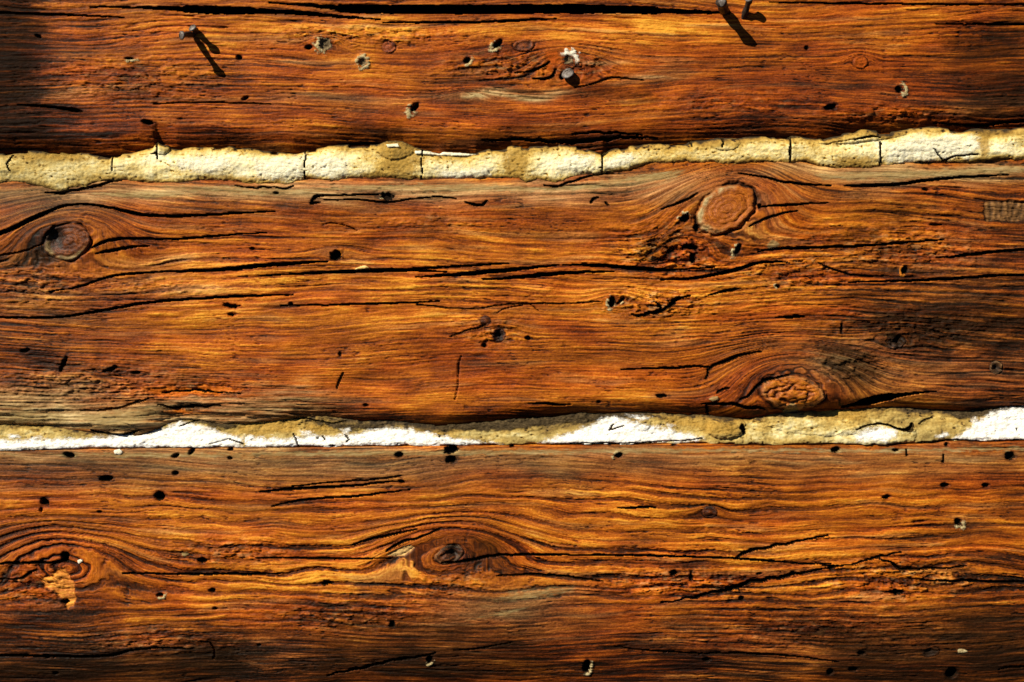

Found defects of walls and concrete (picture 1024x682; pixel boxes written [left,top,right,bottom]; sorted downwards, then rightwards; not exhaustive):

crack [738,119,1024,226]
crack [0,150,1024,337]
crack [441,535,1024,603]